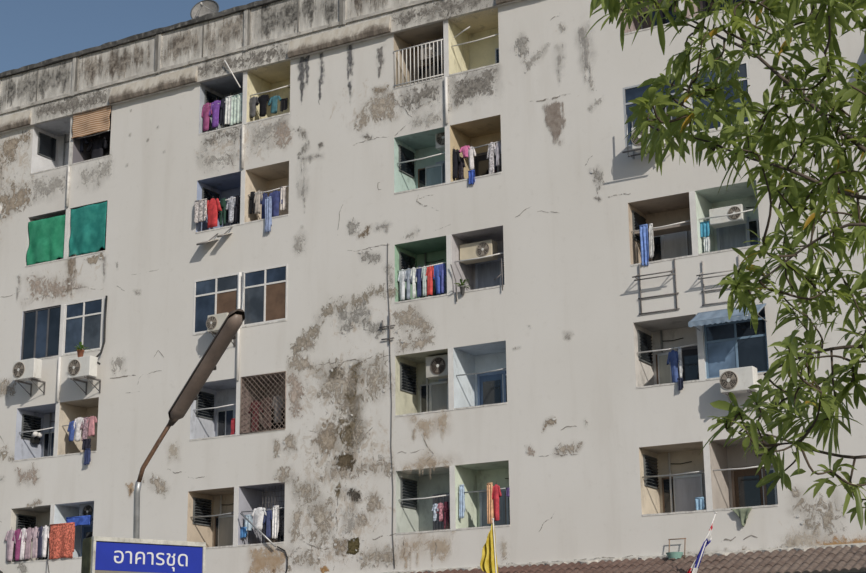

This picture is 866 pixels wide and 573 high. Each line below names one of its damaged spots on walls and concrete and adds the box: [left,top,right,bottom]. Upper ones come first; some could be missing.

water stain [392,0,495,26]
water stain [0,43,150,118]
water stain [161,0,337,78]
water stain [298,53,323,102]
water stain [372,69,497,130]
water stain [579,27,593,86]
peeling [0,130,31,169]
peeling [0,180,35,219]
peeling [359,251,381,264]
peeling [273,285,436,571]
peeling [0,449,40,486]
peeling [790,487,848,536]